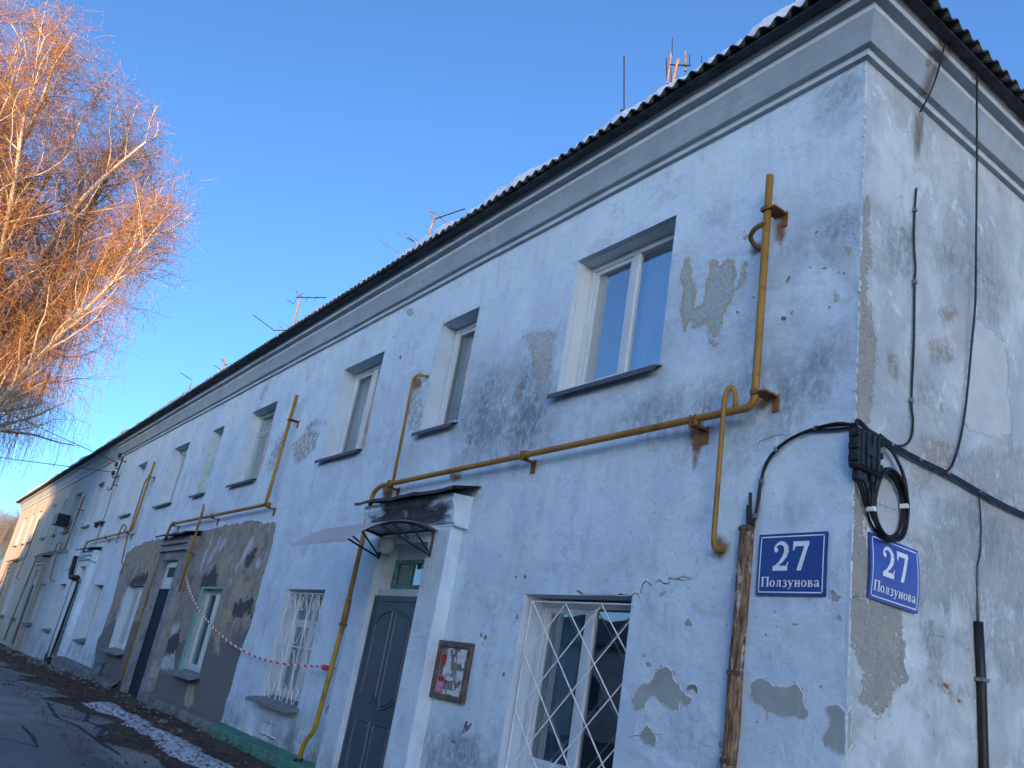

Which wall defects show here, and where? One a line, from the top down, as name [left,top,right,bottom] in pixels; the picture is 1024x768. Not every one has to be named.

peeling [680,257,748,347]
corrosion [690,424,703,464]
leakage [408,503,447,521]
crack [592,573,693,596]
flaking render [93,520,276,721]
peeling [822,485,909,756]
flaking render [631,654,699,713]
flaking render [749,677,811,723]
flaking render [639,723,658,747]